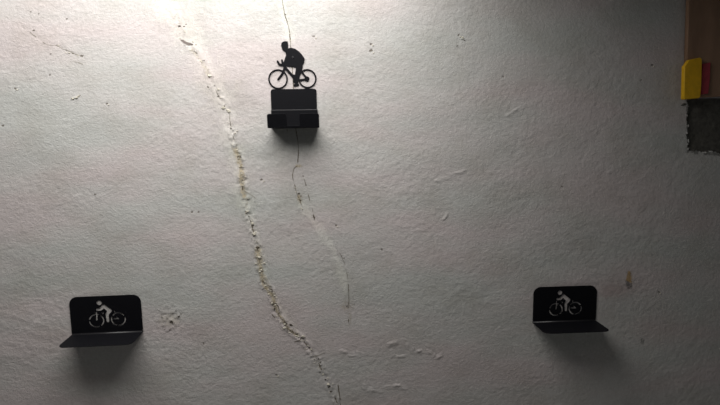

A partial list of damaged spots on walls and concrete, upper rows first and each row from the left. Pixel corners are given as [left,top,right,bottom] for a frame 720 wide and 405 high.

crack [133,0,341,405]
crack [292,128,350,322]